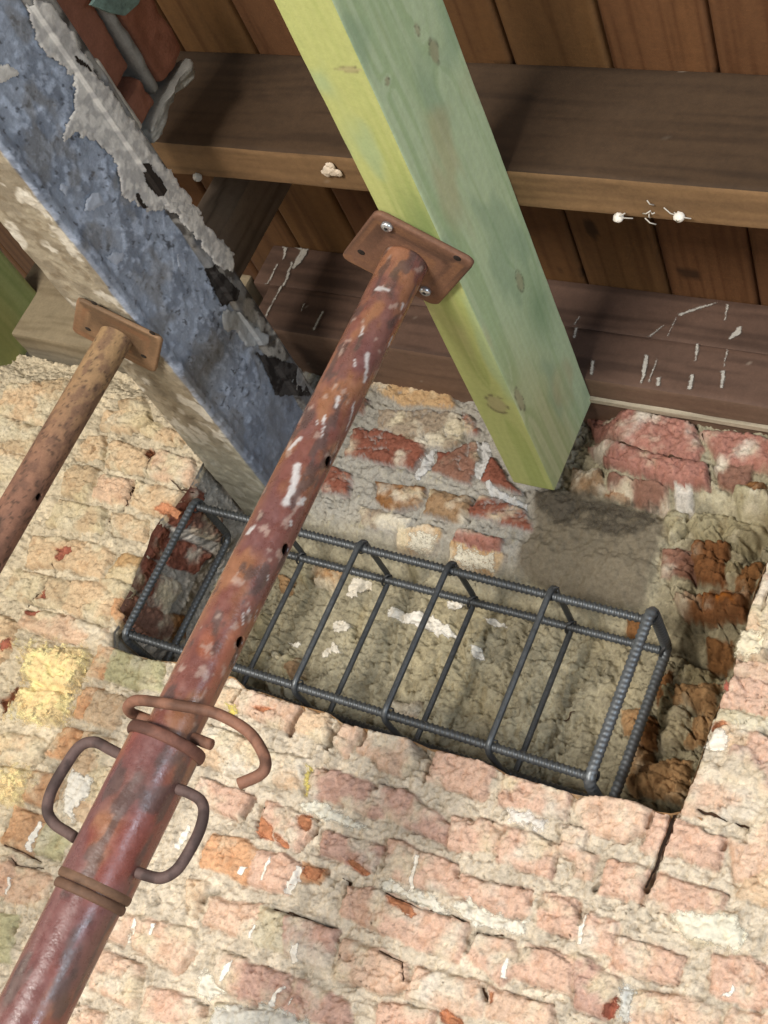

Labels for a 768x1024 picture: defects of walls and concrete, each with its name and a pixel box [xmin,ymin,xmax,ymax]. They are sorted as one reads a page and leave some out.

peeling [0,64,19,83]
peeling [26,0,311,397]
spalling [155,502,181,519]
crack [645,809,750,889]